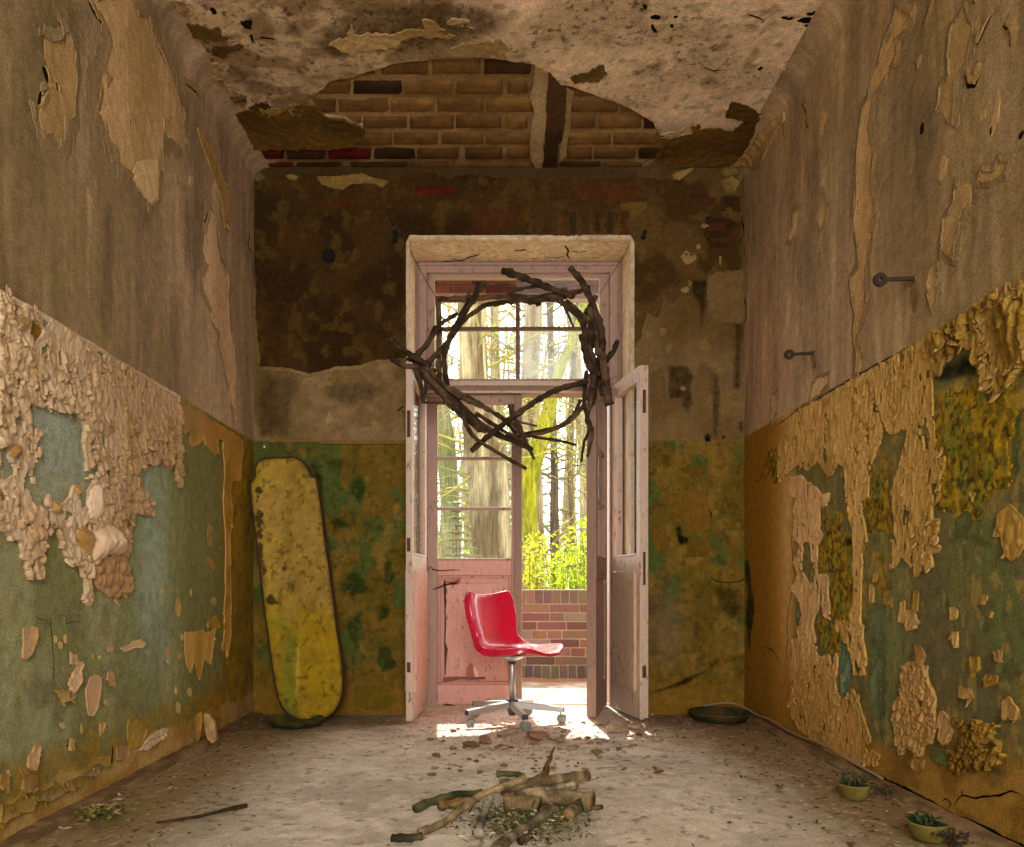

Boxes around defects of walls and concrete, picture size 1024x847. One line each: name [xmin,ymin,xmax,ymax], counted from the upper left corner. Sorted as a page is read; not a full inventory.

water stain [320,8,495,48]
flaking render [230,18,764,386]
peeling [0,0,244,714]
peeling [764,0,1024,776]
water stain [676,526,688,544]
peeling [54,635,146,751]
peeling [116,717,169,761]
peeling [0,744,42,830]
crack [853,764,1024,847]